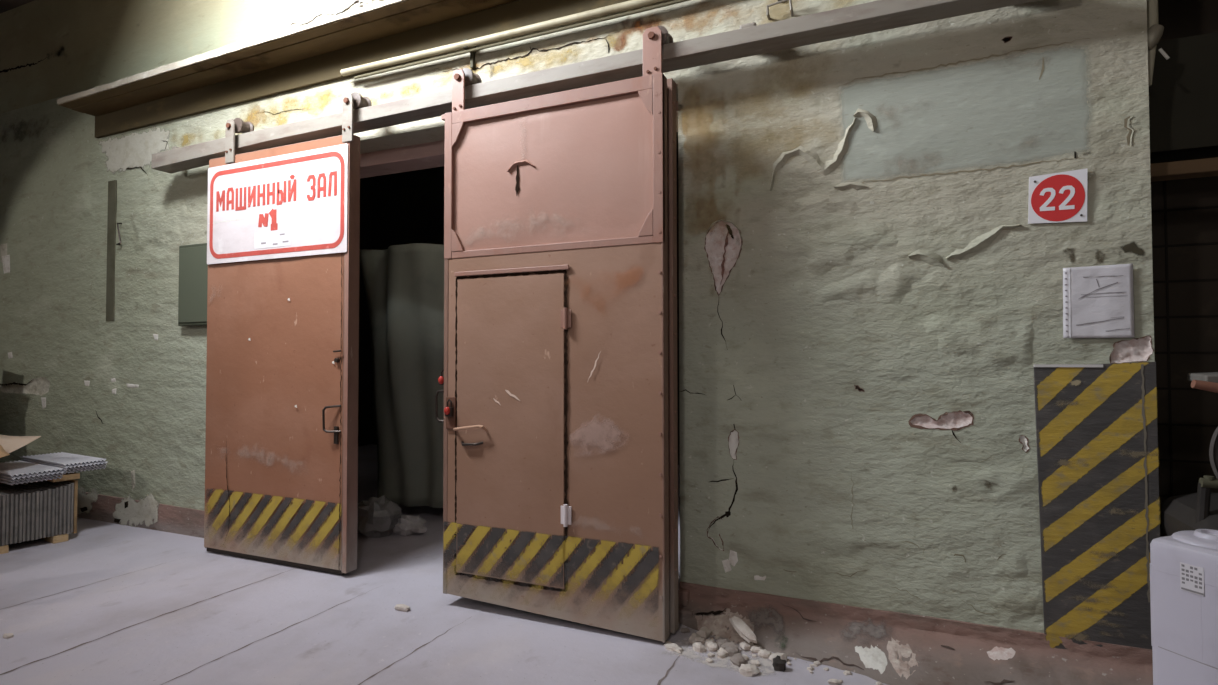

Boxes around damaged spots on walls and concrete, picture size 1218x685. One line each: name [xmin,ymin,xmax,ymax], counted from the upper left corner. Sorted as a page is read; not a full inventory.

crack [0,57,47,73]
crack [439,31,619,77]
spalling [704,219,743,350]
spalling [1109,335,1154,363]
spalling [908,410,974,443]
crack [679,385,796,580]
spalling [695,608,754,644]
crack [798,654,864,670]
spalling [855,637,918,679]